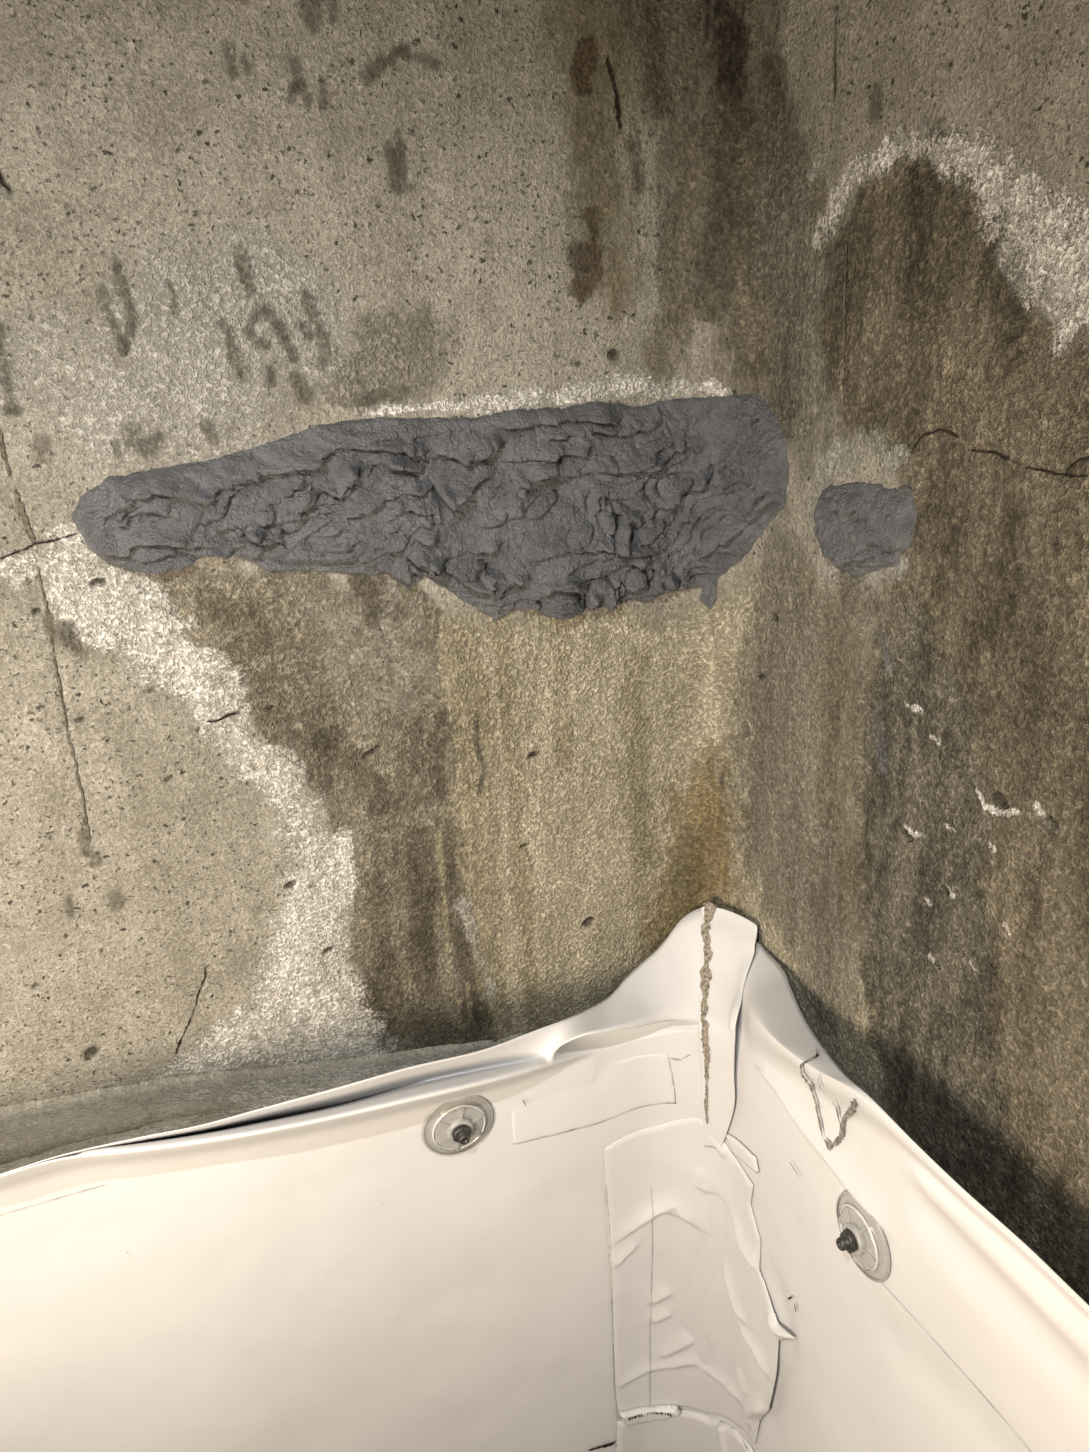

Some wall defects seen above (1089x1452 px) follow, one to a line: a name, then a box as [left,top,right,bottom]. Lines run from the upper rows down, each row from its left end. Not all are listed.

crack [0,174,12,195]
water stain [0,213,733,473]
water stain [156,1043,501,1121]
water stain [1061,1057,1089,1120]